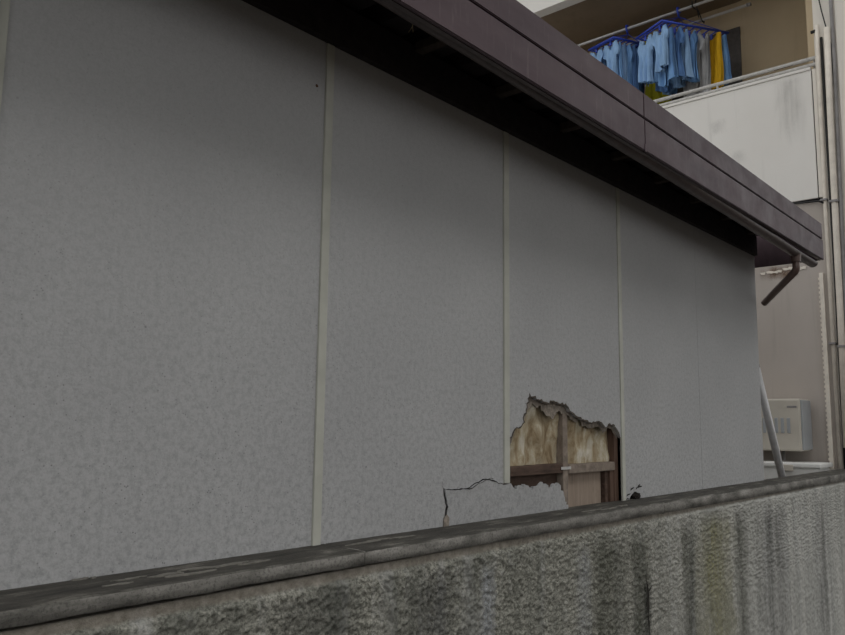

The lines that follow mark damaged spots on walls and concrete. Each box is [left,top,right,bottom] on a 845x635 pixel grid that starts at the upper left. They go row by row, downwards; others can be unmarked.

crack [442,478,507,527]
spalling [503,393,642,512]